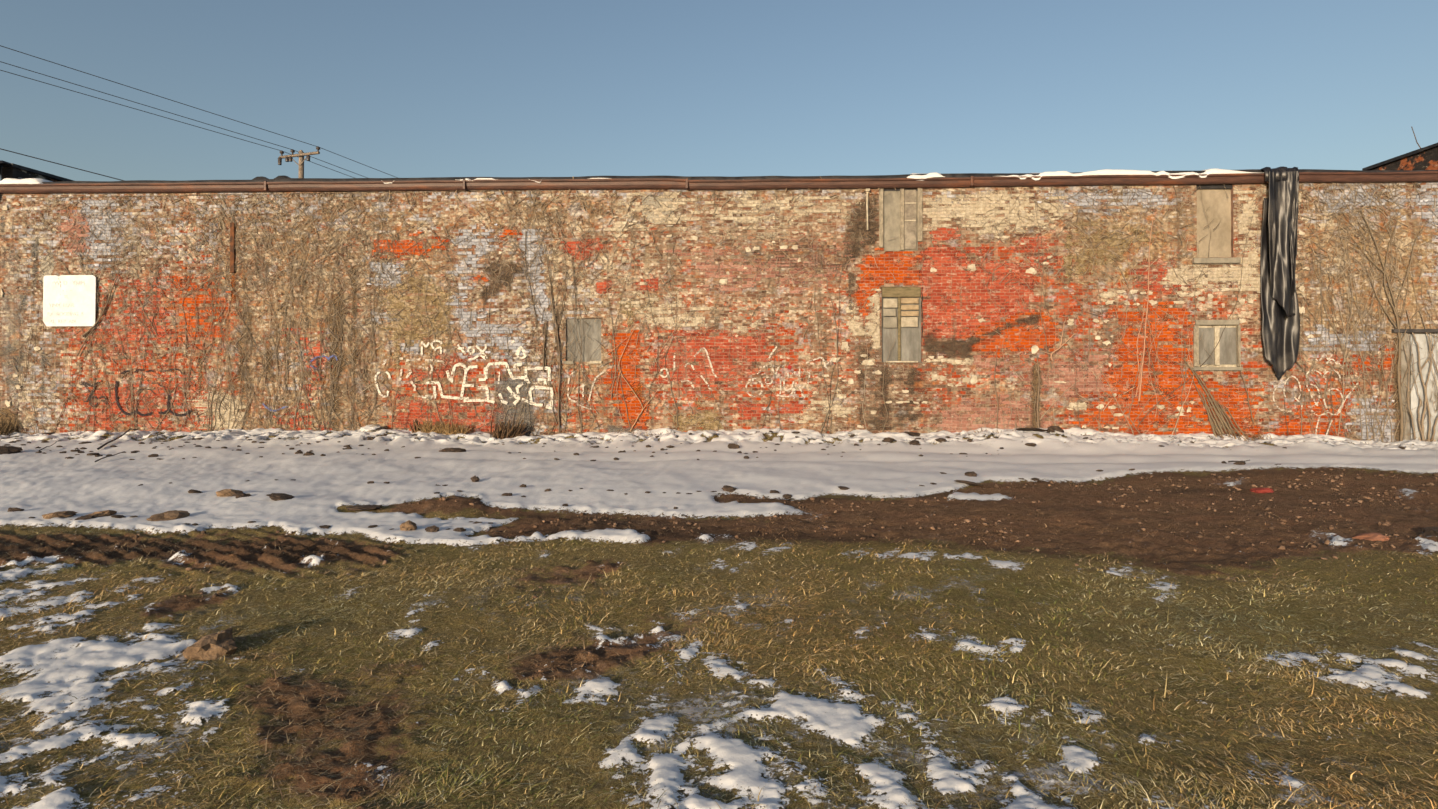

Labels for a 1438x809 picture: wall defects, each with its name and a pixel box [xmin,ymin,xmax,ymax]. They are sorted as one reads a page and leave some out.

spalling [51,200,246,432]
peeling [1413,182,1438,237]